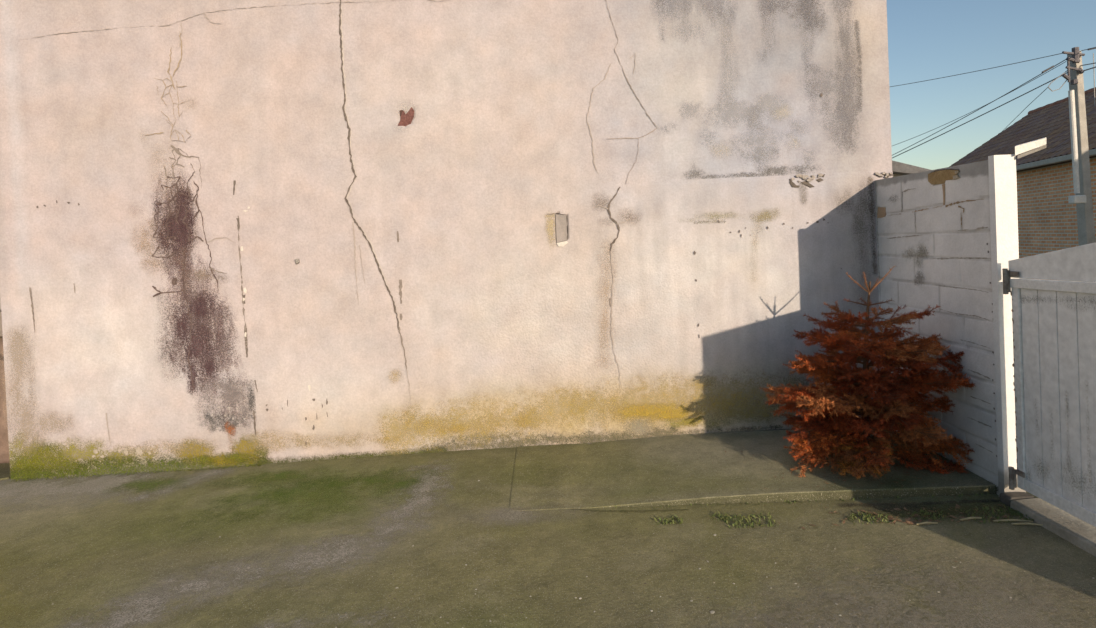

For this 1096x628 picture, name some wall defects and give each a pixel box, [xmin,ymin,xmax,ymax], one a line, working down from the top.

water stain [138,176,254,430]
crack [21,0,411,435]
water stain [384,378,798,453]
crack [587,1,657,390]
water stain [716,87,814,203]
water stain [804,0,862,149]